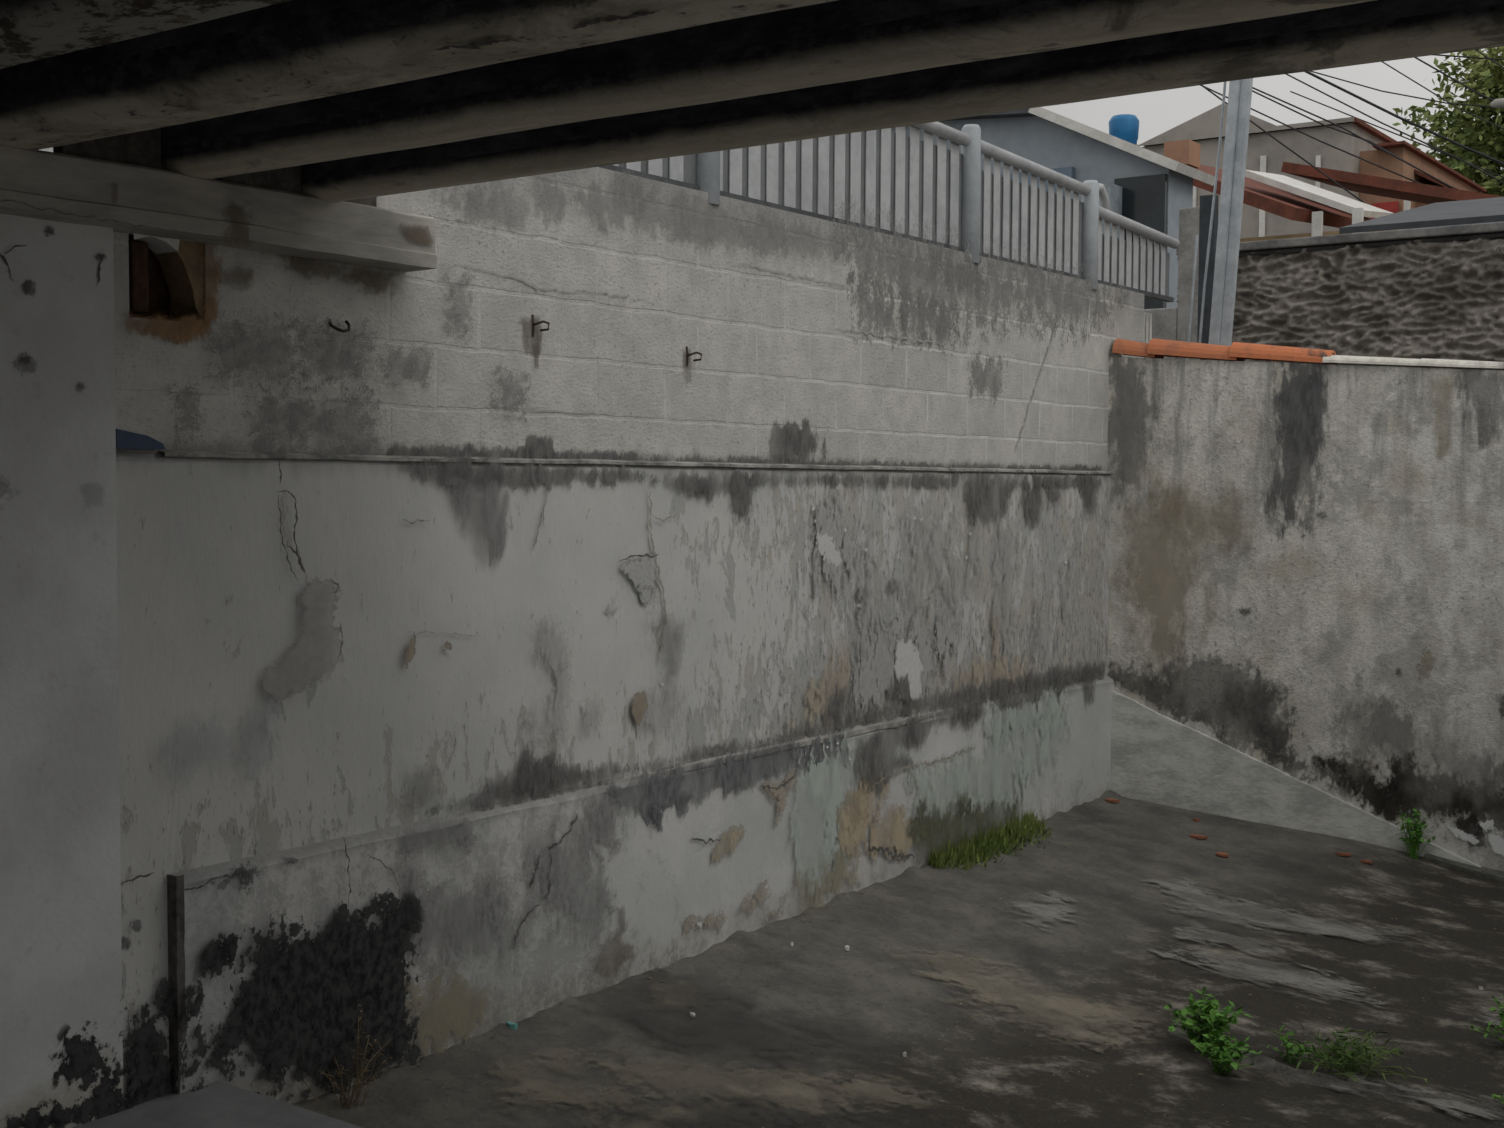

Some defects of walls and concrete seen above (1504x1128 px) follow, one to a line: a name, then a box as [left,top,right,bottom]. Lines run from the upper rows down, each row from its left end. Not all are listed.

crack [0,245,27,281]
spalling [151,241,204,319]
damp [831,202,1128,400]
crack [278,456,307,581]
spalling [619,553,659,605]
damp [202,316,1158,558]
peeling [804,493,960,712]
damp [1265,350,1328,537]
crack [513,813,578,949]
damp [6,658,1504,1128]
peeling [760,689,1074,904]
peeling [1447,819,1504,857]